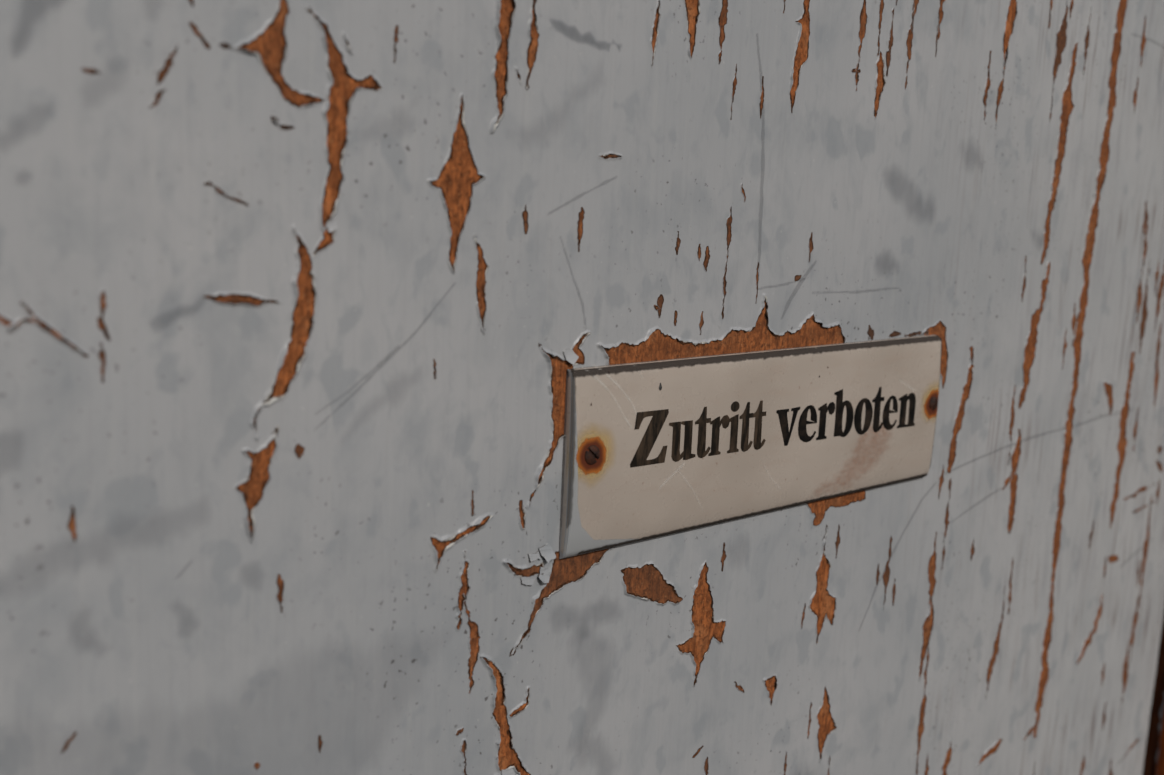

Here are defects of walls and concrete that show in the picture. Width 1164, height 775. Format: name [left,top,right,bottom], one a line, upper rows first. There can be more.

peeling [489,0,541,135]
peeling [683,0,701,61]
peeling [0,300,90,359]
peeling [201,0,385,545]
peeling [425,91,490,336]
peeling [517,292,846,531]
peeling [921,319,948,390]
peeling [1103,381,1113,417]
peeling [428,512,495,574]
peeling [479,544,614,775]
peeling [619,560,727,689]
peeling [805,490,866,645]